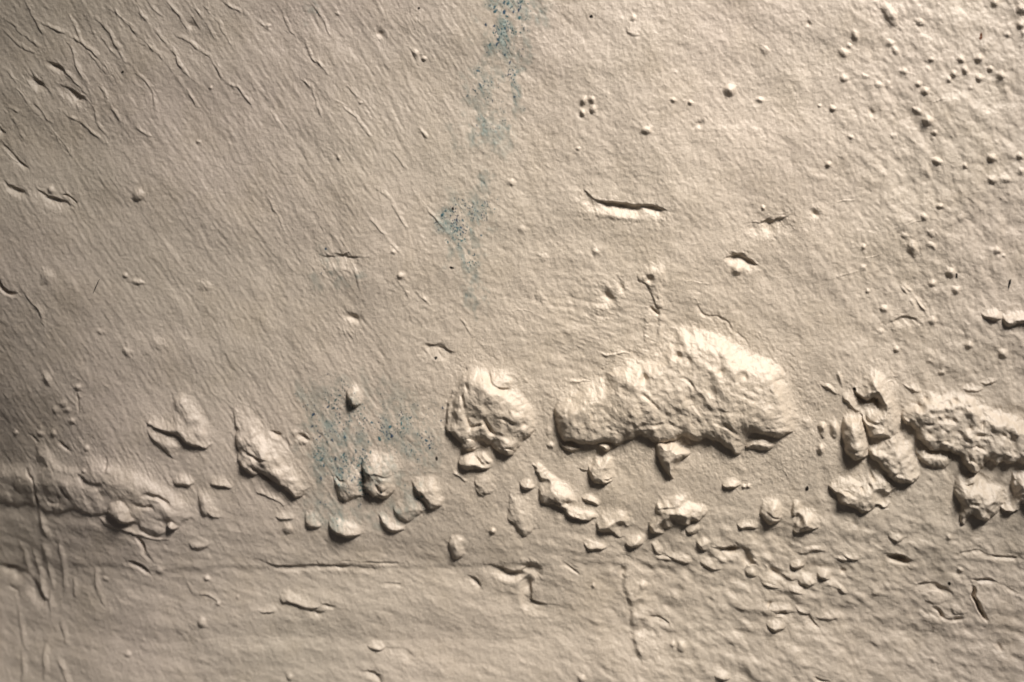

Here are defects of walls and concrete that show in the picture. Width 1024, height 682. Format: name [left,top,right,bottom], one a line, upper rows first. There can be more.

water stain [467,0,543,106]
water stain [435,198,498,277]